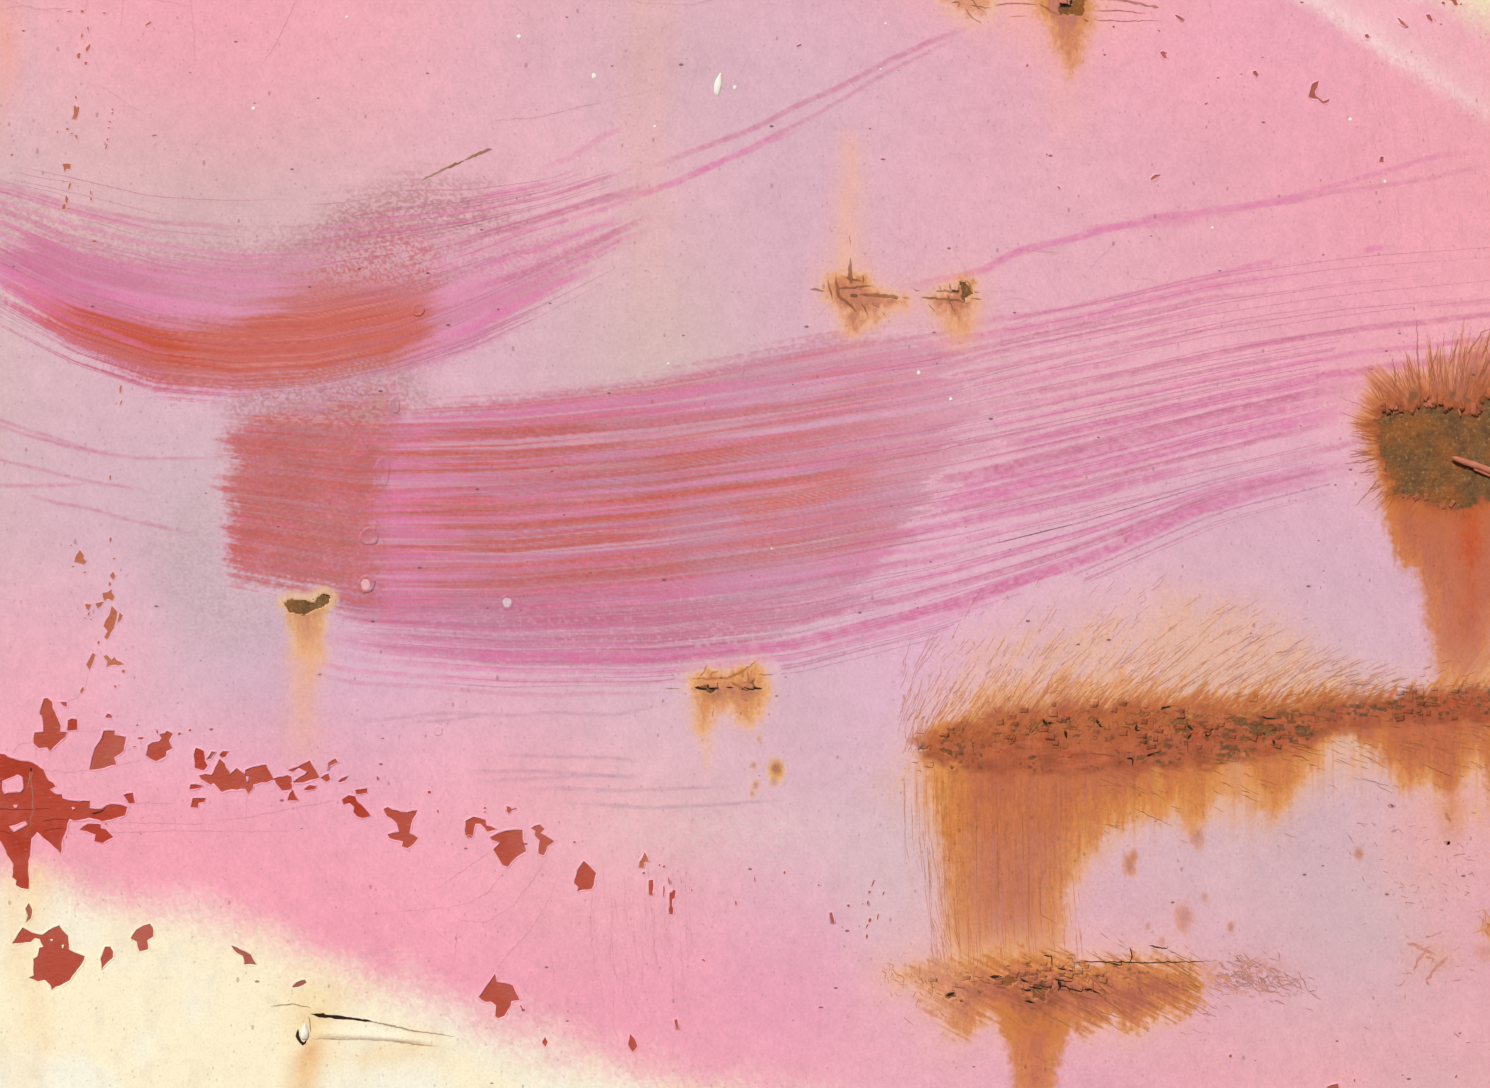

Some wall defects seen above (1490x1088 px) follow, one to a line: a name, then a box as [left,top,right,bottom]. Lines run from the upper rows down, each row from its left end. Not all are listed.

corrosion [876,0,1241,90]
corrosion [790,235,1009,368]
peeling [0,536,137,992]
peeling [88,711,440,851]
corrosion [265,582,346,776]
corrosion [666,646,790,801]
corrosion [837,301,1490,1088]
peeling [129,922,155,953]
peeling [229,943,259,967]
peeling [476,972,525,1021]
peeling [463,805,599,893]
peeling [638,851,694,915]